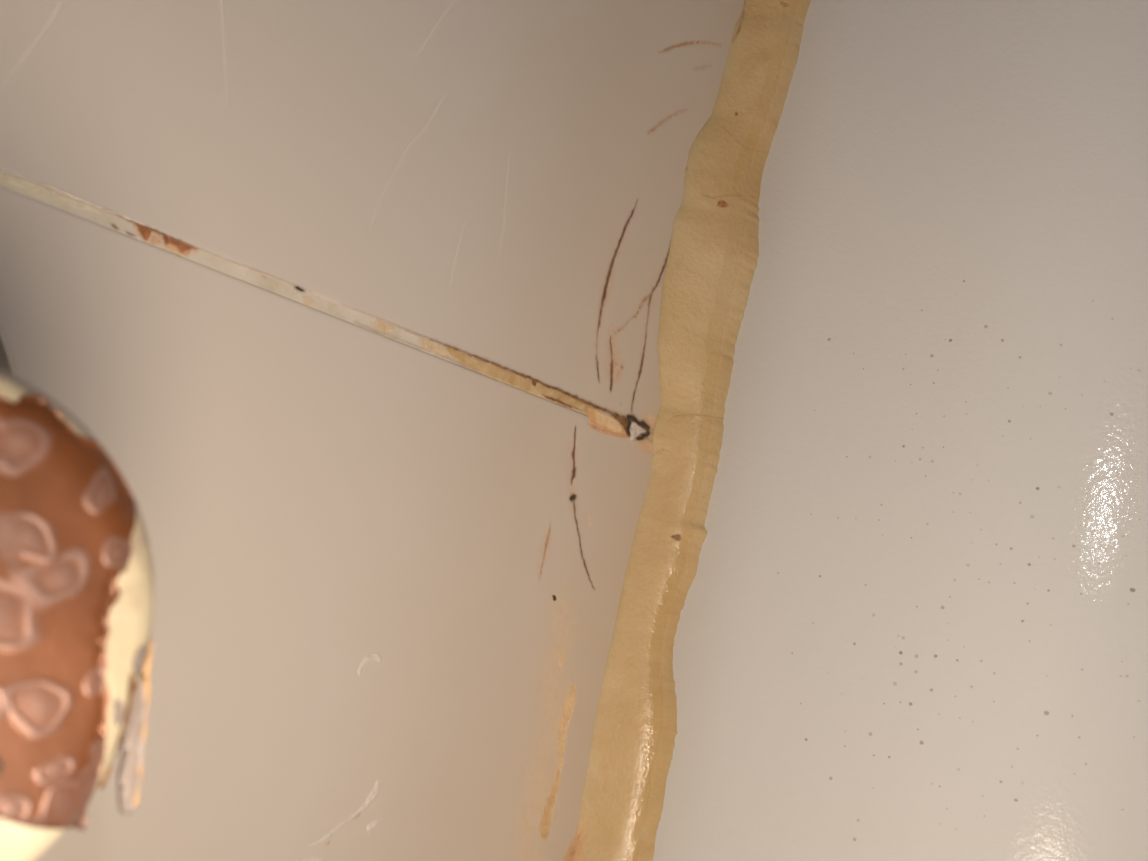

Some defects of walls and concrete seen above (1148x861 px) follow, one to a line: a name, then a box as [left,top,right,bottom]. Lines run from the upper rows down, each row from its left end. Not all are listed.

crack [110,211,185,243]
rust [111,224,194,255]
crack [637,249,670,314]
crack [432,209,645,588]
peeling [99,636,152,815]